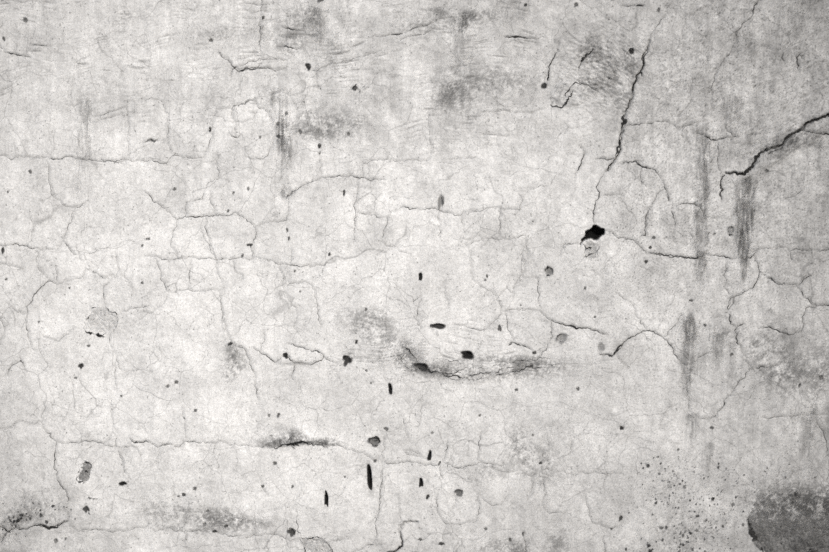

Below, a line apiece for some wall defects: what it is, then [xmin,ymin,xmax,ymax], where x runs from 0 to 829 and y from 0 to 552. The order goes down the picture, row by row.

crack [220,27,275,72]
crack [48,156,122,255]
crack [158,172,287,291]
crack [578,47,829,344]
crack [238,335,330,380]
crack [483,281,701,364]
crack [49,433,157,499]
crack [0,521,106,538]
mould [646,479,727,552]